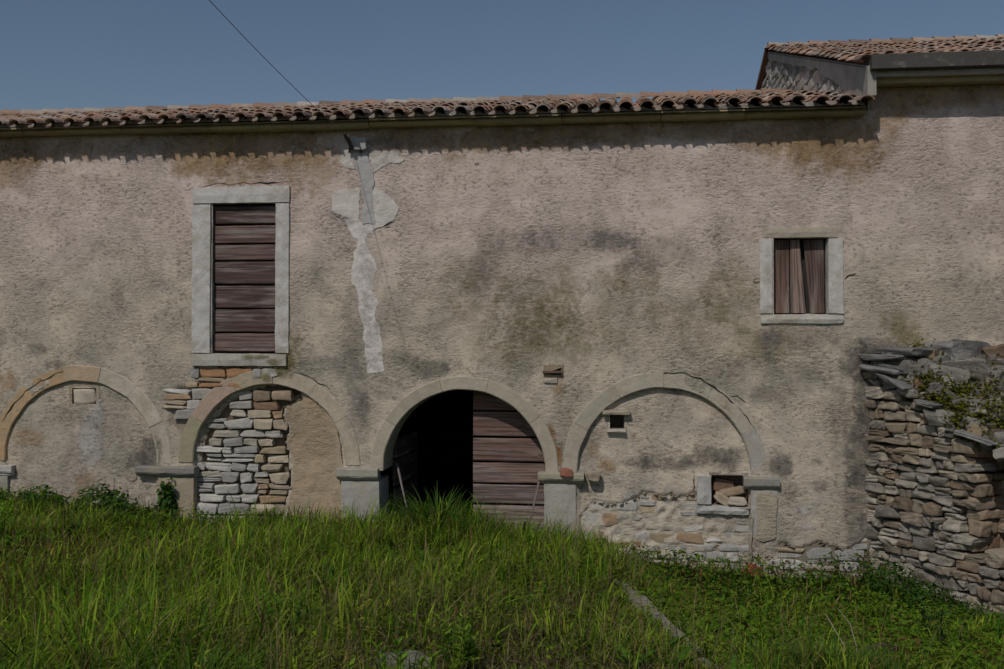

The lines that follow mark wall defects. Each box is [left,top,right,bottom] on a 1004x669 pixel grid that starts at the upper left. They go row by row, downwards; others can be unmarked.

flaking render [331,142,404,374]
crack [651,372,756,431]
flaking render [581,491,876,579]